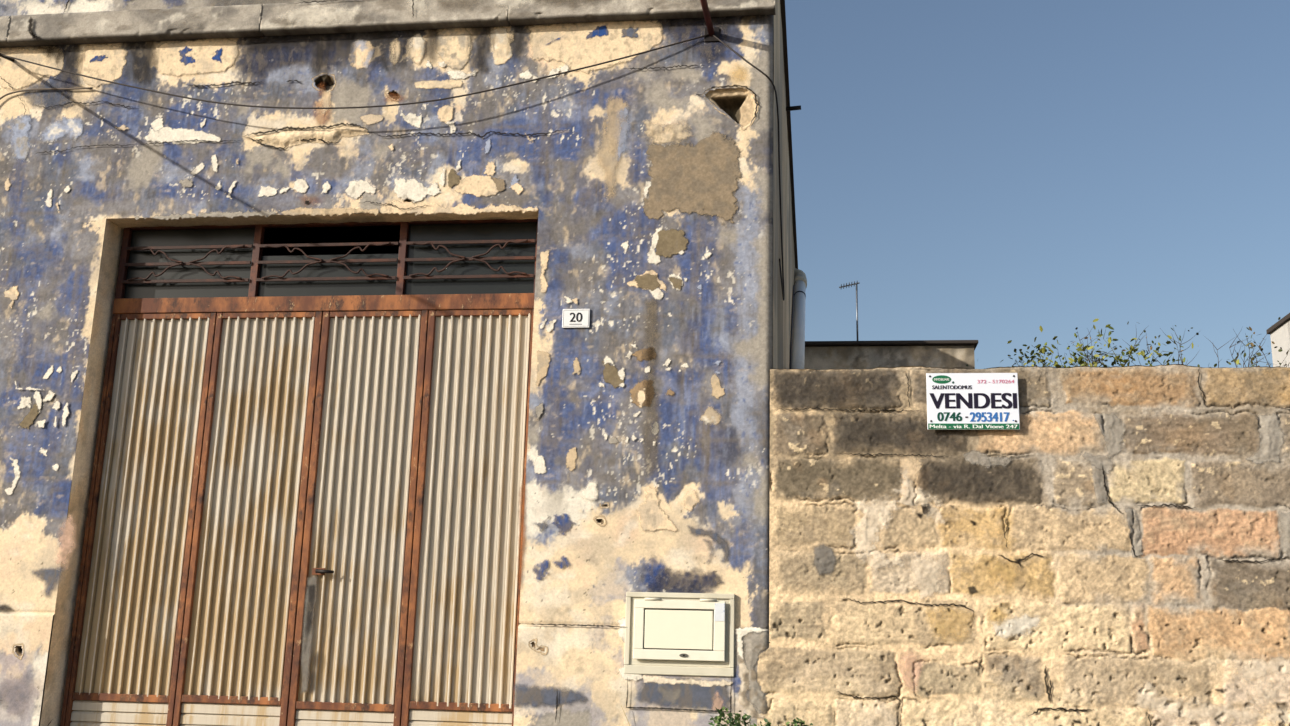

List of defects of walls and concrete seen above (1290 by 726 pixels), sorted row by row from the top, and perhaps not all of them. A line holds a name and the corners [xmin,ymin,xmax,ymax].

peeling [0,44,127,90]
peeling [154,38,239,76]
spalling [312,73,336,93]
peeling [350,40,374,69]
peeling [390,28,476,89]
peeling [490,20,662,82]
peeling [135,118,538,220]
flaking render [627,85,759,300]
peeling [15,365,78,429]
peeling [599,344,688,417]
damp [33,518,72,596]
rust [301,576,318,693]